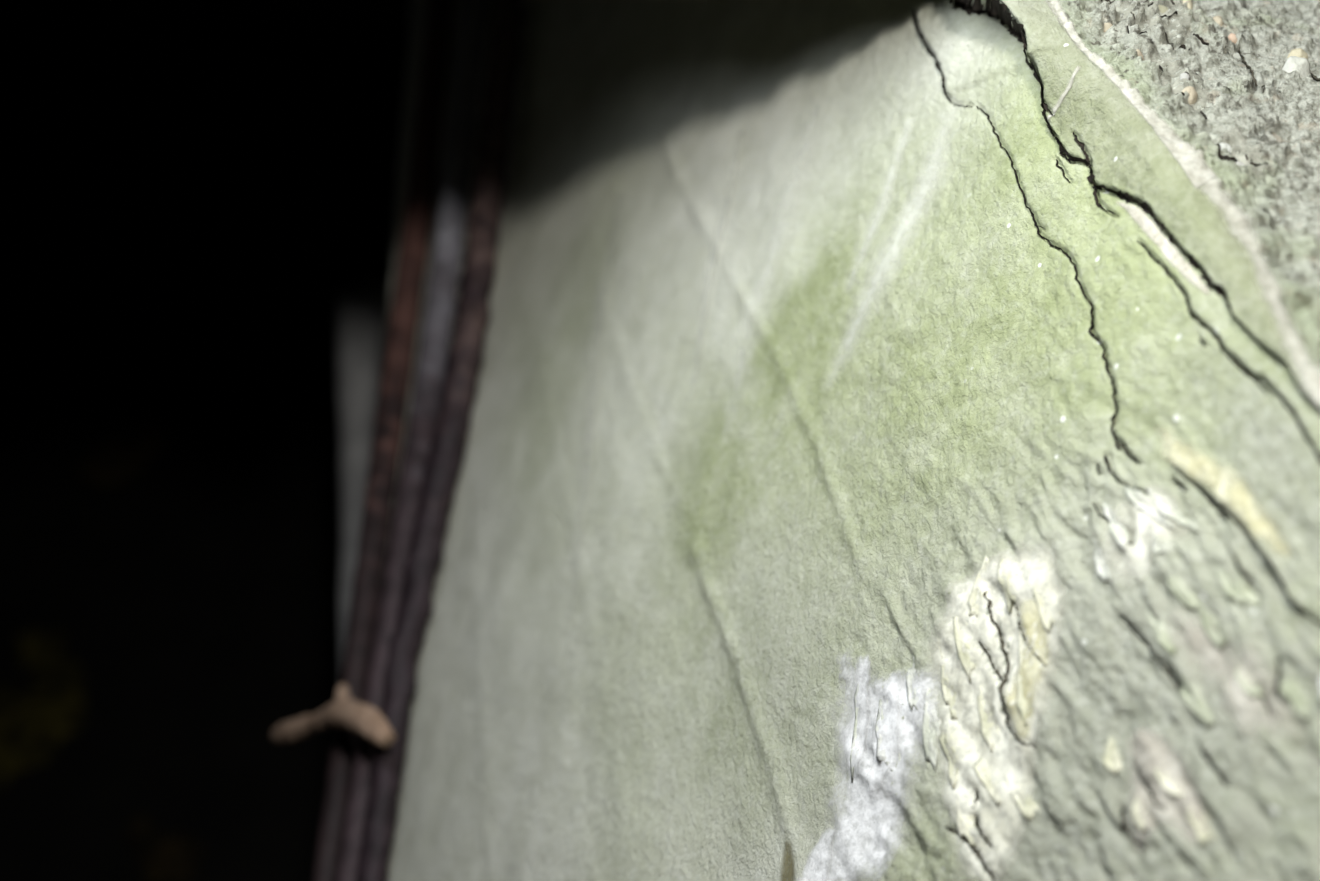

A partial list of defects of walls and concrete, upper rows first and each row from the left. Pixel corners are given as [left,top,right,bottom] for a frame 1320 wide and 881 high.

crack [911,0,1320,623]
peeling [1092,486,1200,581]
peeling [1214,566,1259,606]
damp [800,656,942,881]
peeling [933,550,1063,881]
crack [978,591,1047,747]
crack [1119,614,1180,692]
peeling [1103,731,1216,844]
crack [1201,749,1228,785]
peeling [1146,576,1320,762]
crack [1260,657,1287,718]